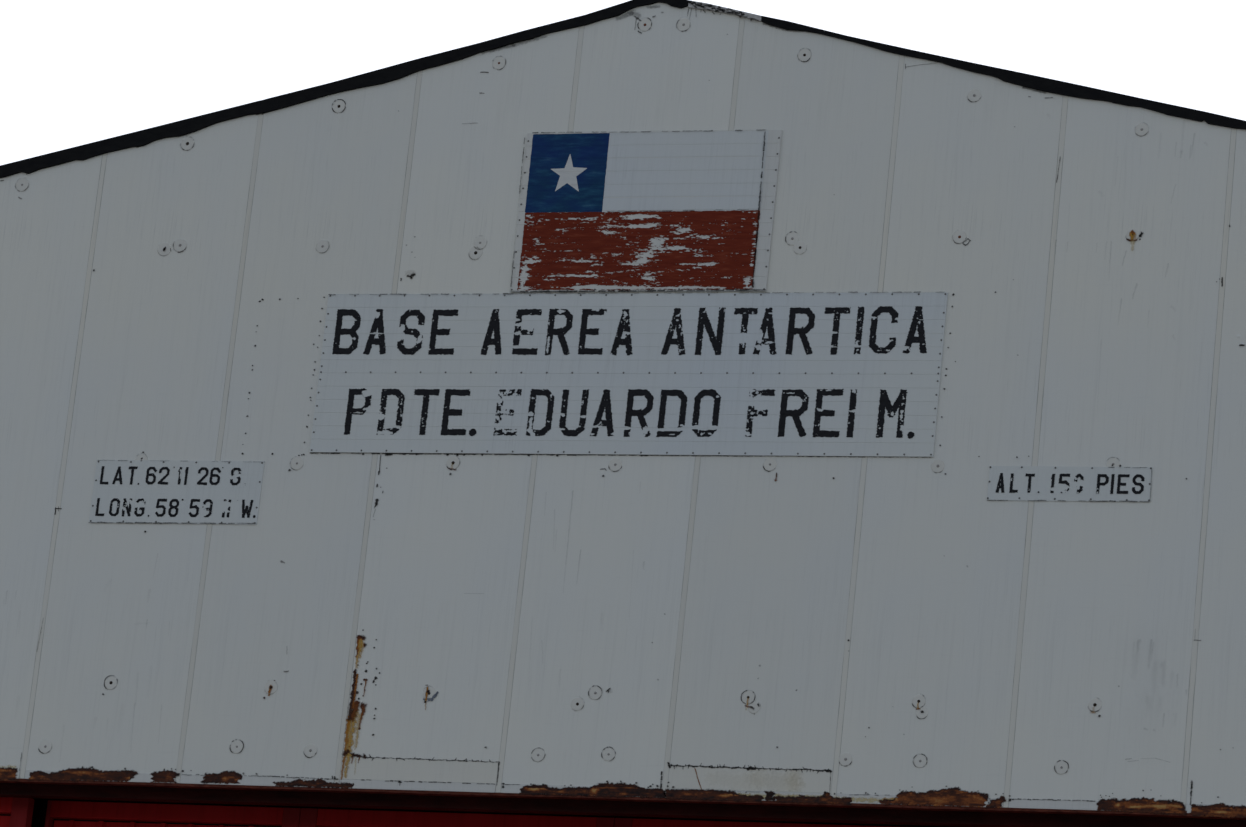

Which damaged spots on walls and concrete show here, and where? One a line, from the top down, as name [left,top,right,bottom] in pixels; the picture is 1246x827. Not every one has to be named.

rust [0,635,1246,820]